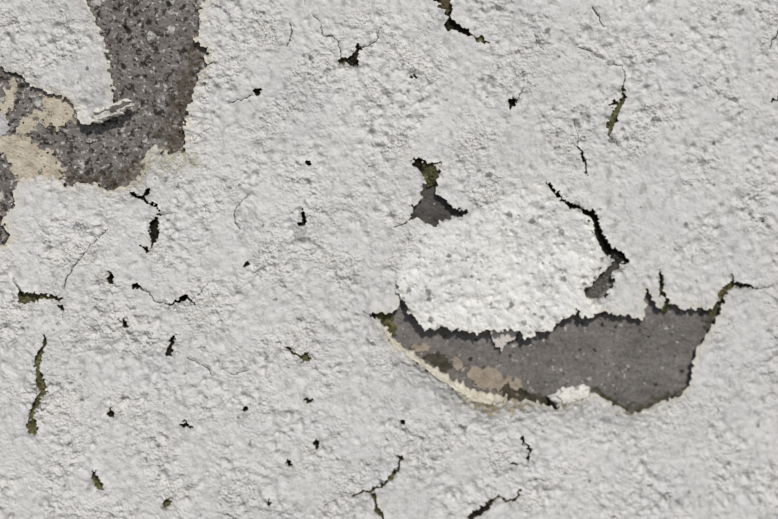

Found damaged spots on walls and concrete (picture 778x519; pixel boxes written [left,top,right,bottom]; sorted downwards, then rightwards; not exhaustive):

crack [313,15,382,67]
peeling [0,0,213,246]
crack [578,47,627,146]
crack [13,229,108,318]
crack [130,188,172,253]
crack [140,284,208,306]
peeling [375,157,728,413]
crack [546,181,629,299]
crack [26,334,48,434]
crack [352,455,403,519]
crack [467,489,522,519]
crack [510,436,532,465]